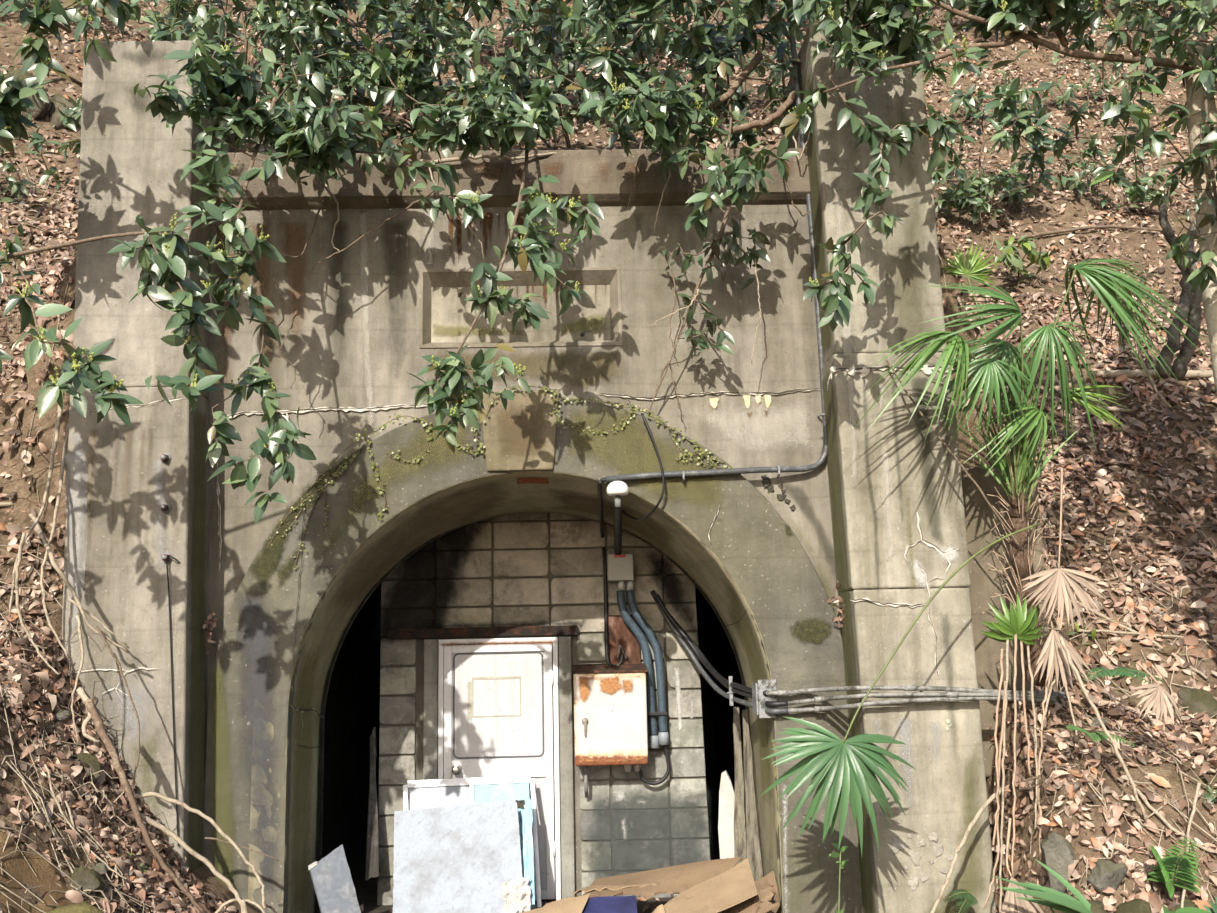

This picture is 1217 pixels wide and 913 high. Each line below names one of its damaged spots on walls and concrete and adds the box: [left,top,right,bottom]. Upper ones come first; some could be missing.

rust [448,213,523,256]
crack [850,512,958,676]
damp [239,597,275,885]